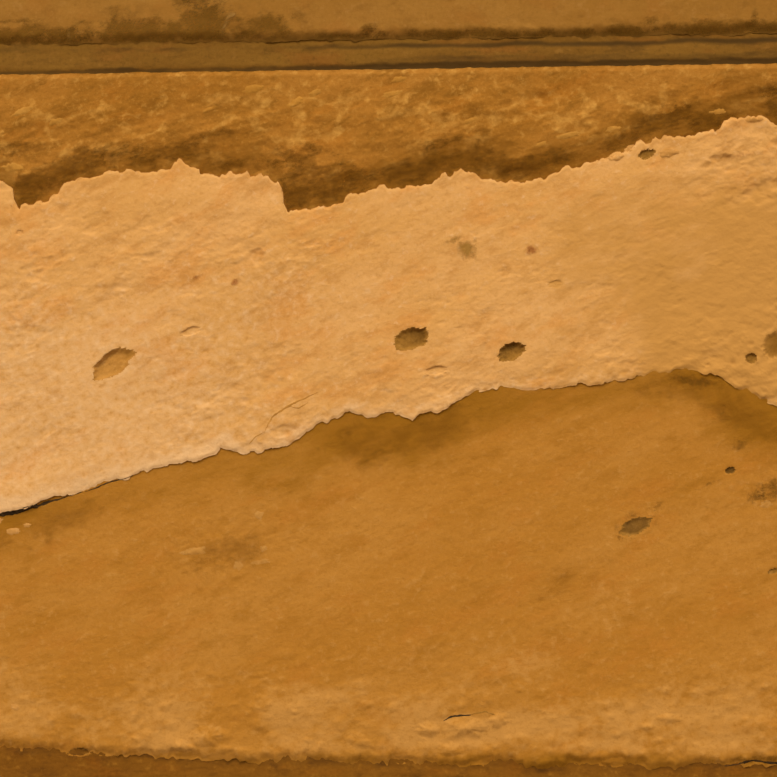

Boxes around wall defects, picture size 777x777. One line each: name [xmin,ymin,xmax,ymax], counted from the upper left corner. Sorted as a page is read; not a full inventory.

water stain [0,5,289,44]
water stain [670,14,776,34]
peeling [0,108,777,535]
spalling [613,513,658,539]